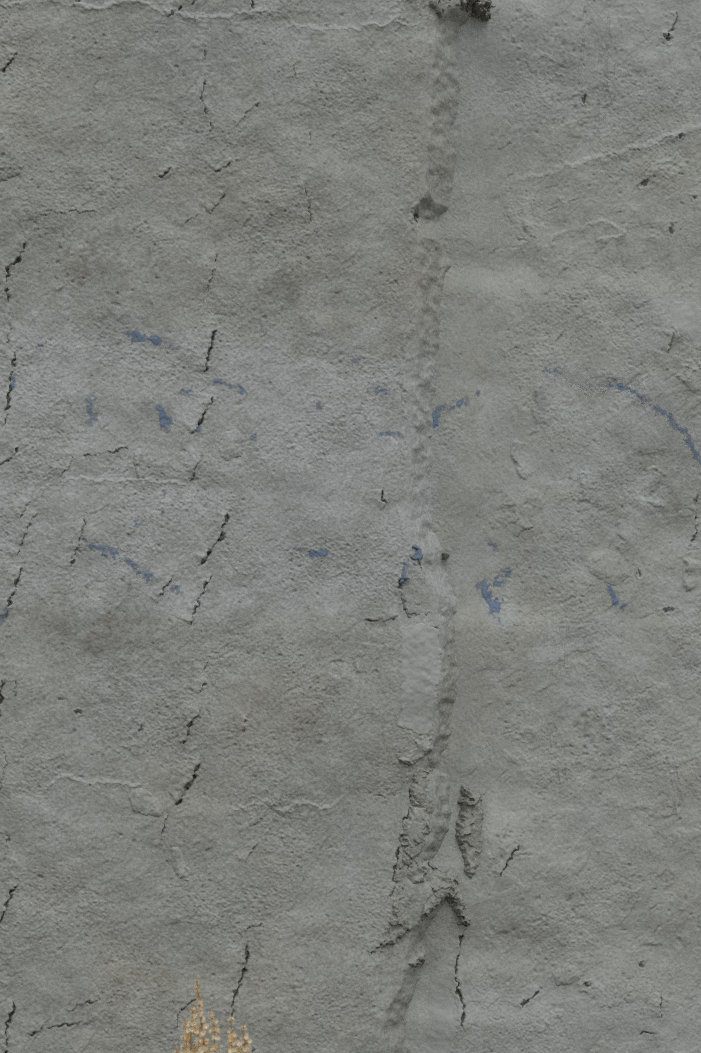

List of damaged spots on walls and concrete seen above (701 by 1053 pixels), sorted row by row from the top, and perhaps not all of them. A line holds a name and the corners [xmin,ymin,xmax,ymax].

crack [5,243,25,302]
crack [5,340,16,423]
crack [204,330,216,372]
crack [6,514,28,618]
crack [190,514,228,624]
crack [162,764,200,831]
crack [390,791,410,897]
spalling [398,736,434,869]
crack [231,923,261,1017]
crack [455,925,466,1027]
crack [5,1002,63,1053]